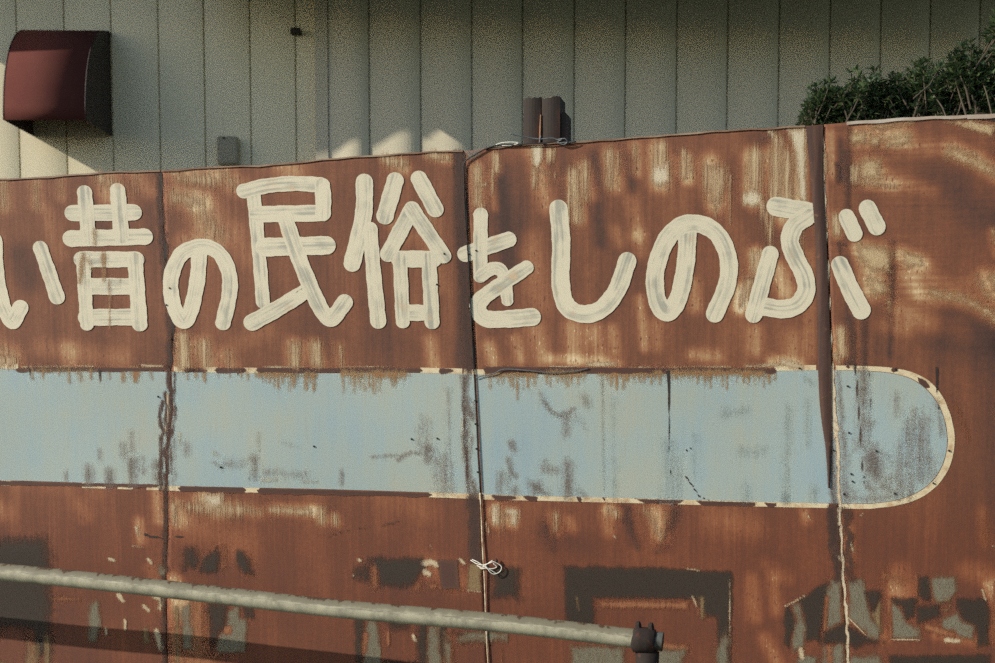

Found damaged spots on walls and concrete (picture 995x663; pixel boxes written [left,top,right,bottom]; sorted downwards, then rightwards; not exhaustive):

peeling [822,140,843,241]
corrosion [0,148,777,580]
peeling [785,323,975,663]
corrosion [825,316,946,586]
peeling [412,547,482,594]
corrosion [157,597,226,663]
peeling [659,639,690,663]